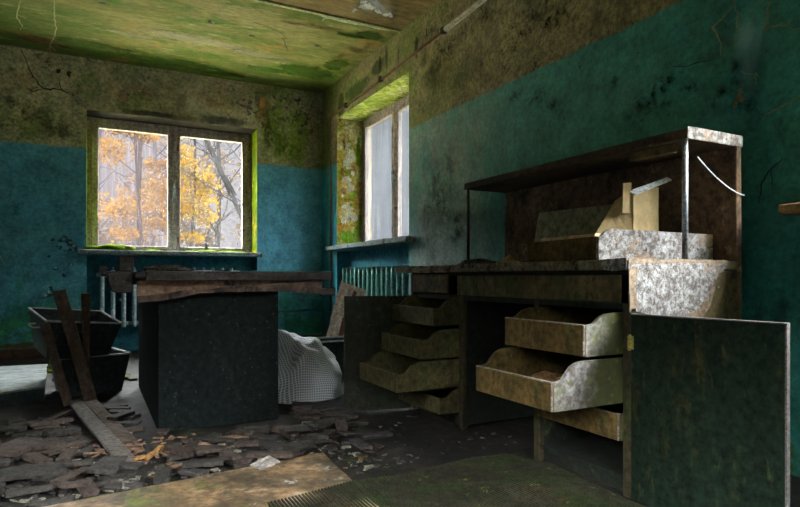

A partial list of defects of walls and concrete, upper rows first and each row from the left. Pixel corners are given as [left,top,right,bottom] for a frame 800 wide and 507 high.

crack [46,1,57,52]
damp [97,28,285,60]
spalling [321,0,393,31]
crack [21,49,86,108]